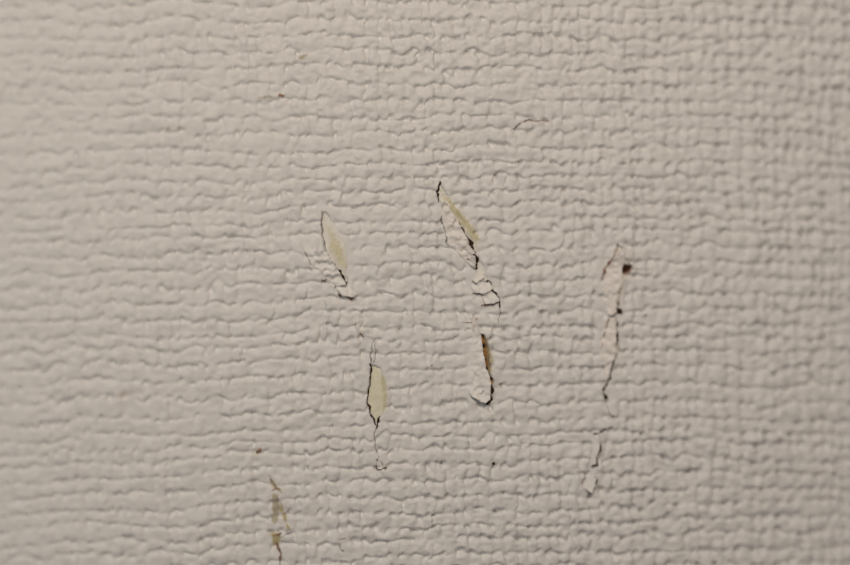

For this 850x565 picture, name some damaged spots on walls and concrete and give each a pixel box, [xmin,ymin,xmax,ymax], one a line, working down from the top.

peeling [304,211,357,300]
peeling [436,181,501,323]
peeling [355,319,387,470]
peeling [461,315,494,405]
peeling [582,427,613,494]
peeling [601,244,653,417]